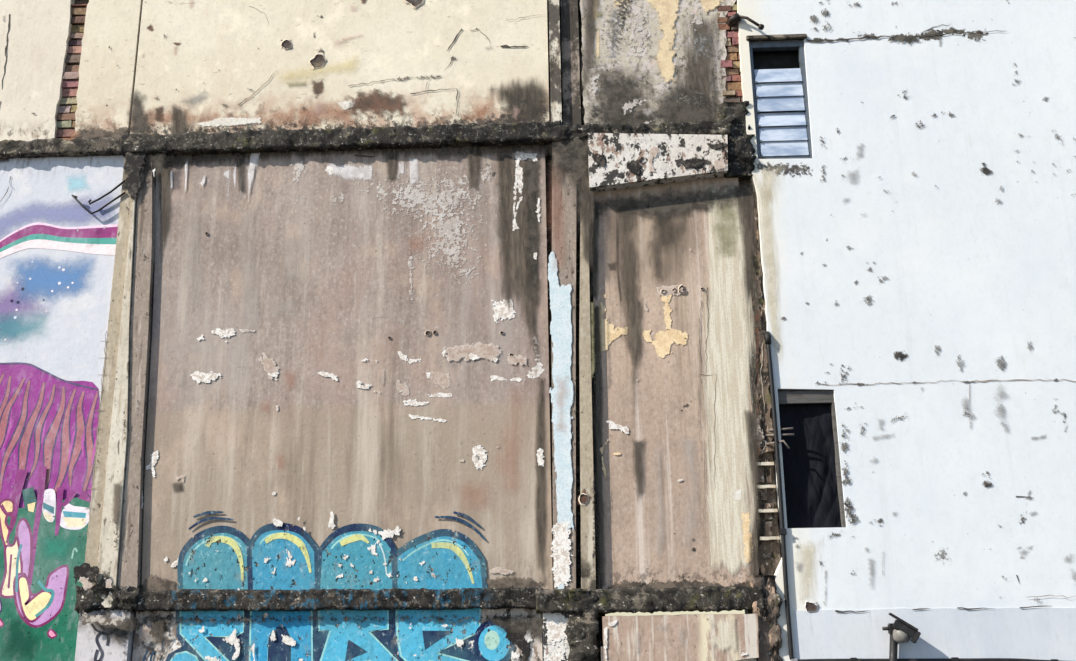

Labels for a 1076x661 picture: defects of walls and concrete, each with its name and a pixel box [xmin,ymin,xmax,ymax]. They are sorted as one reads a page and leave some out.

water stain [584,0,717,126]
flaking render [700,0,743,103]
crack [806,24,999,44]
rust [188,116,265,127]
water stain [129,91,547,134]
rust [279,89,406,123]
rust [499,81,541,114]
water stain [123,133,826,595]
peeling [700,187,794,575]
crack [822,378,1076,401]
peeling [205,629,255,661]
peeling [486,613,568,661]